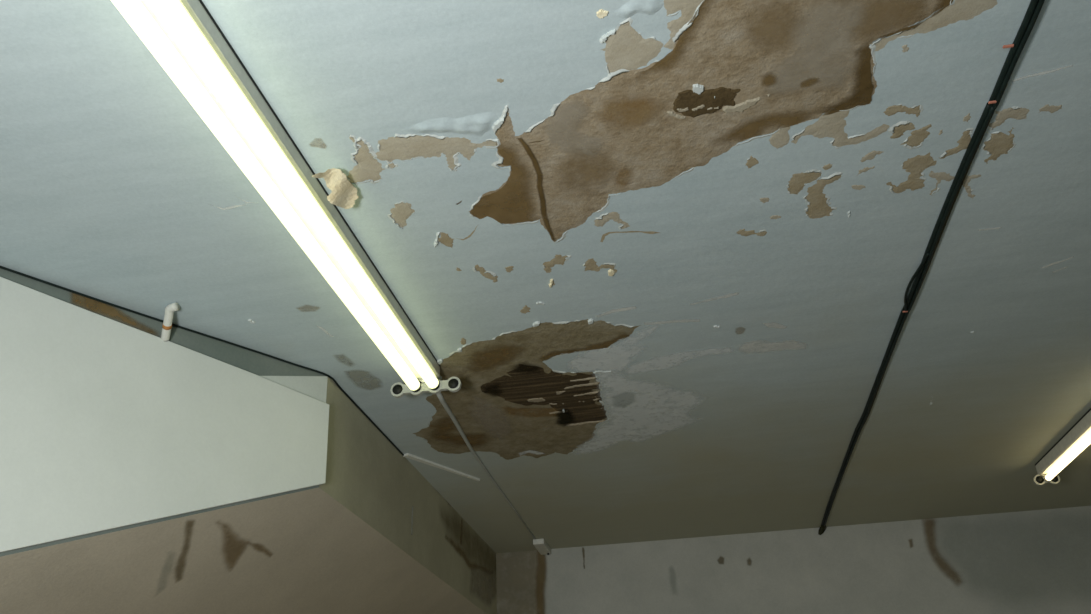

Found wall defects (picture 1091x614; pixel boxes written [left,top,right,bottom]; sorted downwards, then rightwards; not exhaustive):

peeling [312,0,1062,288]
peeling [413,301,641,460]
water stain [569,320,805,454]
water stain [177,522,192,578]
water stain [226,532,269,564]
water stain [926,520,959,581]